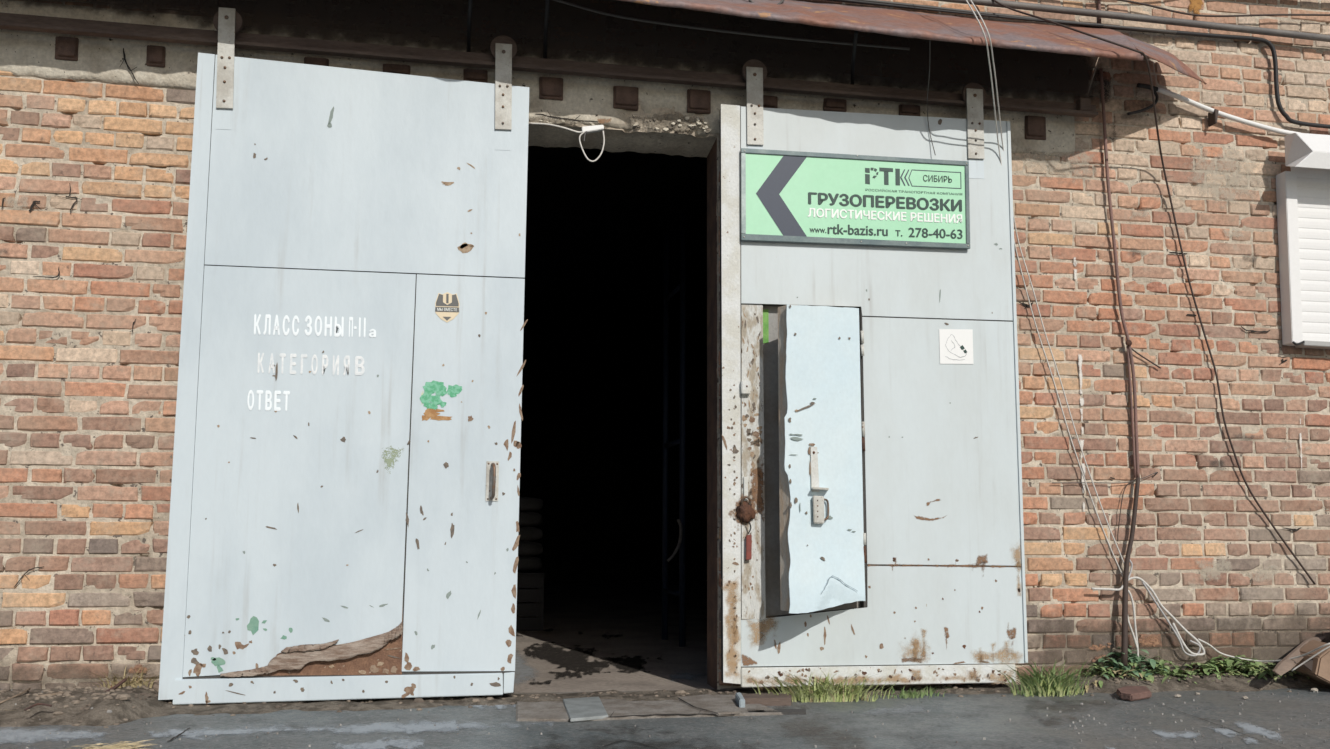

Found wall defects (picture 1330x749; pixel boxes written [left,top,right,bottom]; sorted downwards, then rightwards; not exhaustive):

rust [729,464,764,524]
peeling [179,615,420,704]
leakage [516,627,663,684]
rust [725,582,1018,685]